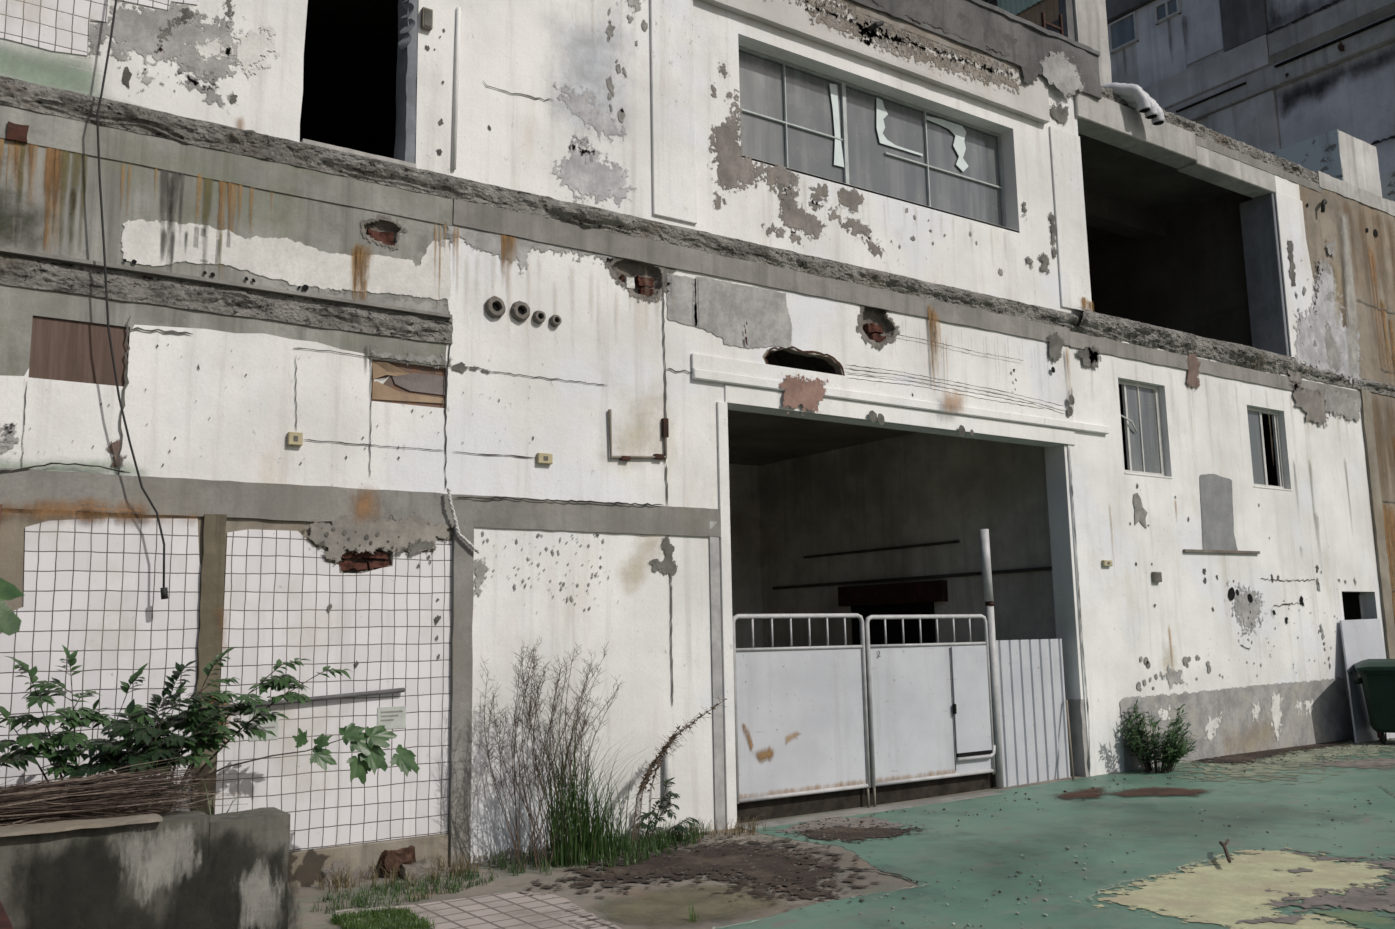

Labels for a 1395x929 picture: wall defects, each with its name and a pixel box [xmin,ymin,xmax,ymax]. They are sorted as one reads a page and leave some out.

peeling [84,0,281,114]
peeling [789,0,1022,95]
corrosion [0,138,63,239]
corrosion [197,174,253,235]
peeling [707,60,946,263]
peeling [121,214,845,413]
spalling [856,305,901,351]
corrosion [928,307,947,366]
peeling [1287,238,1365,427]
peeling [302,510,455,574]
peeling [1058,565,1395,798]
corrosion [743,724,797,761]